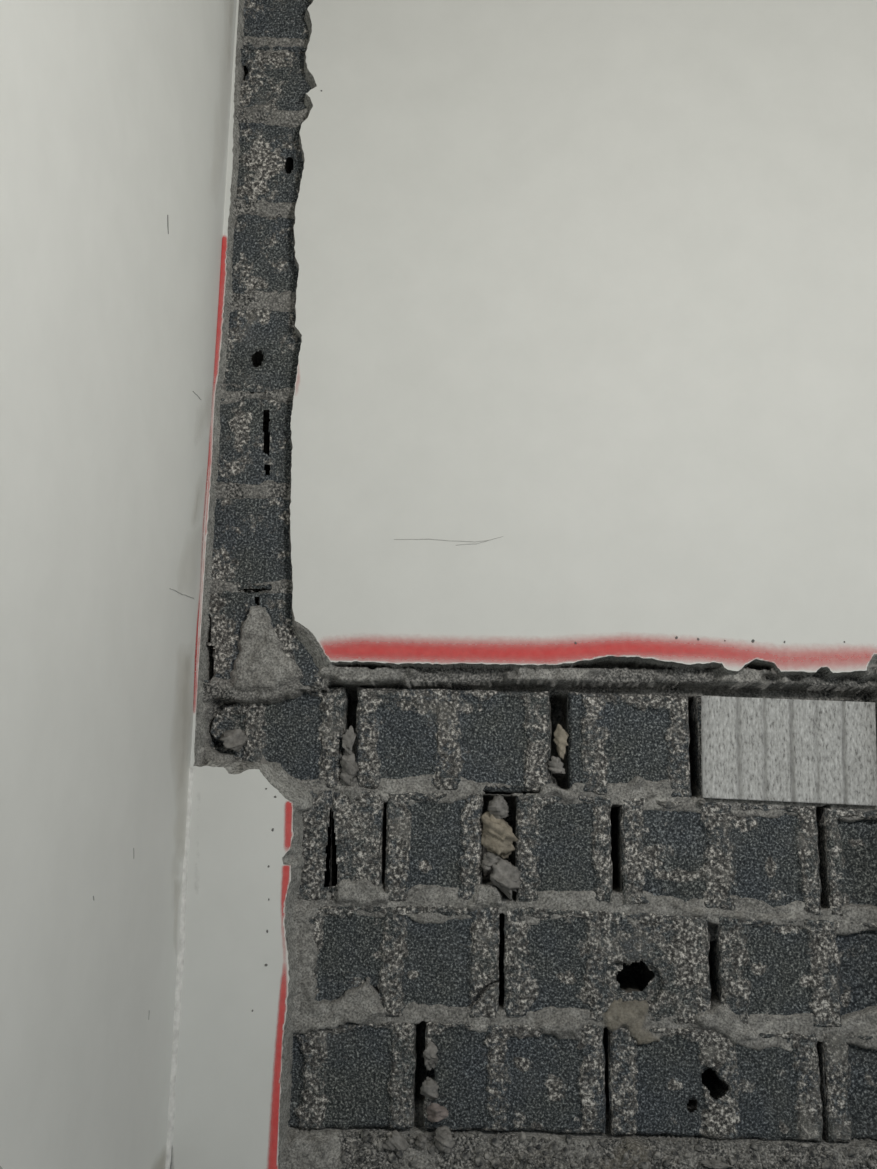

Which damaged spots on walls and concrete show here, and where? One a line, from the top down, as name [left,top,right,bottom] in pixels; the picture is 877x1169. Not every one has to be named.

flaking render [304,0,317,120]
flaking render [193,0,313,1169]
flaking render [291,605,877,745]